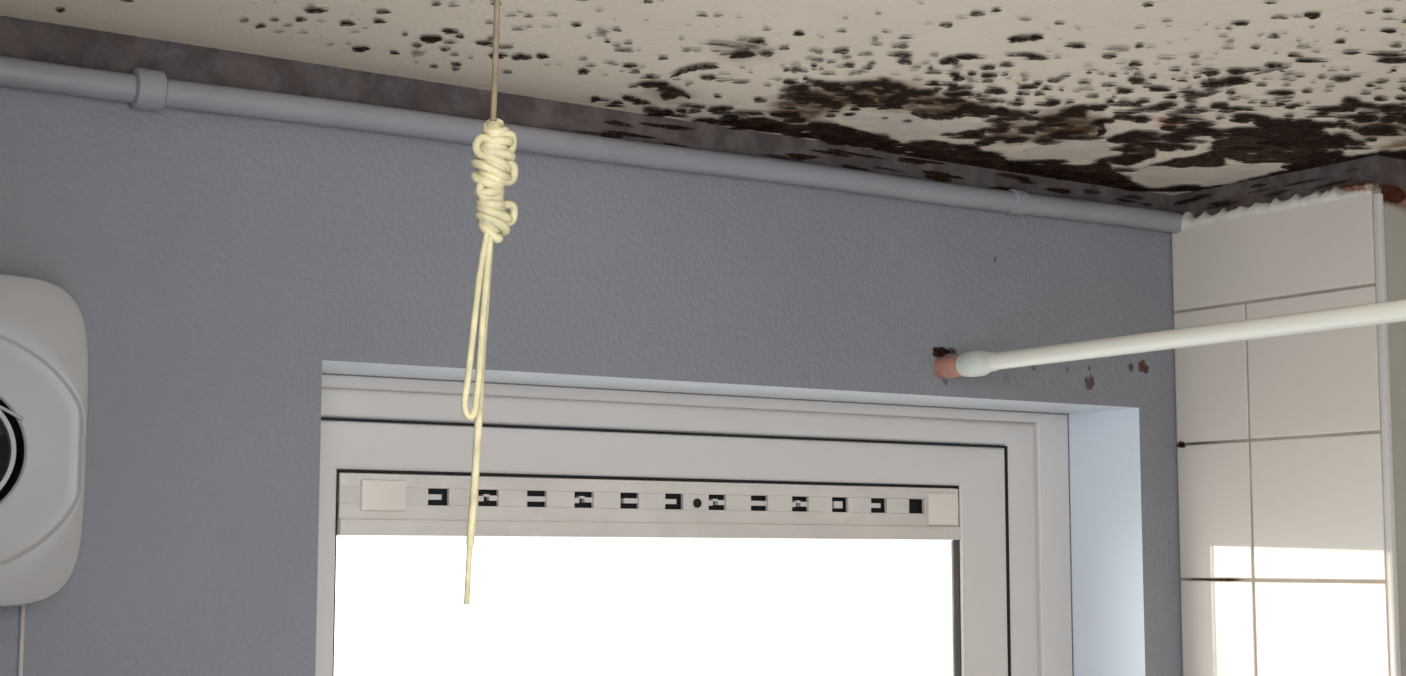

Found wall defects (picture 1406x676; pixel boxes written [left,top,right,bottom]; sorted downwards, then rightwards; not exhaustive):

damp [0,2,1406,218]